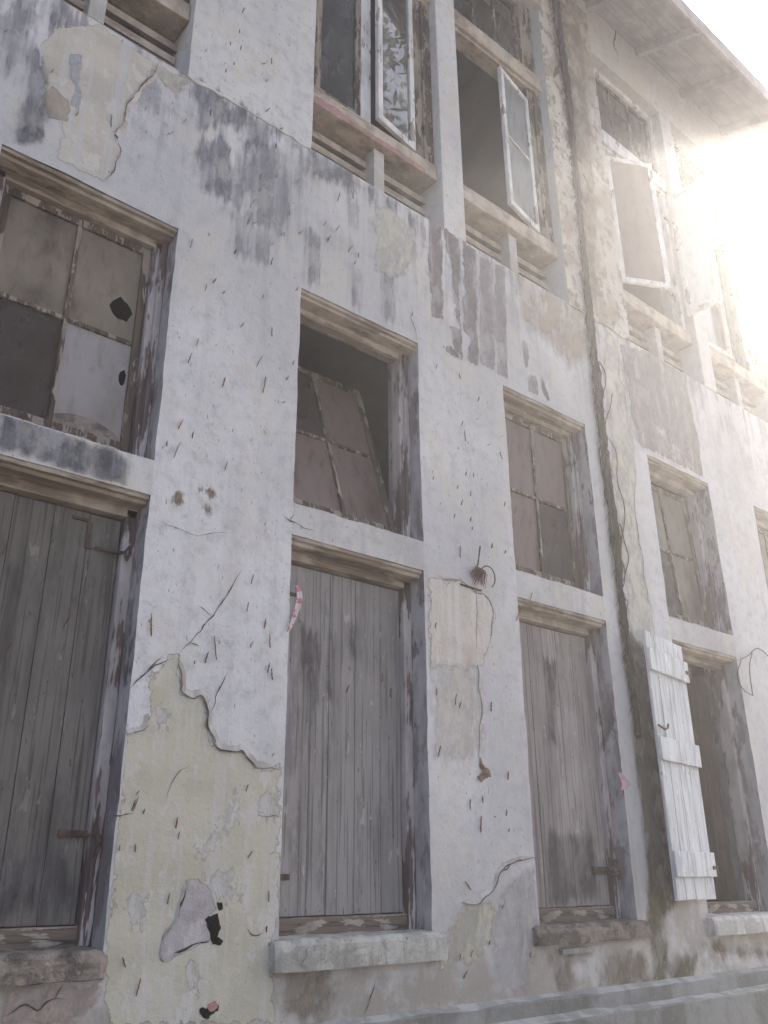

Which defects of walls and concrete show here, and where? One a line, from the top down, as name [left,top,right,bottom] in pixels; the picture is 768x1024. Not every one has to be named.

water stain [17,92,44,143]
peeling [40,23,189,181]
water stain [195,80,288,230]
water stain [0,415,127,482]
crack [132,572,280,770]
peeling [427,576,496,782]
peeling [104,653,282,1024]
crack [461,858,531,905]